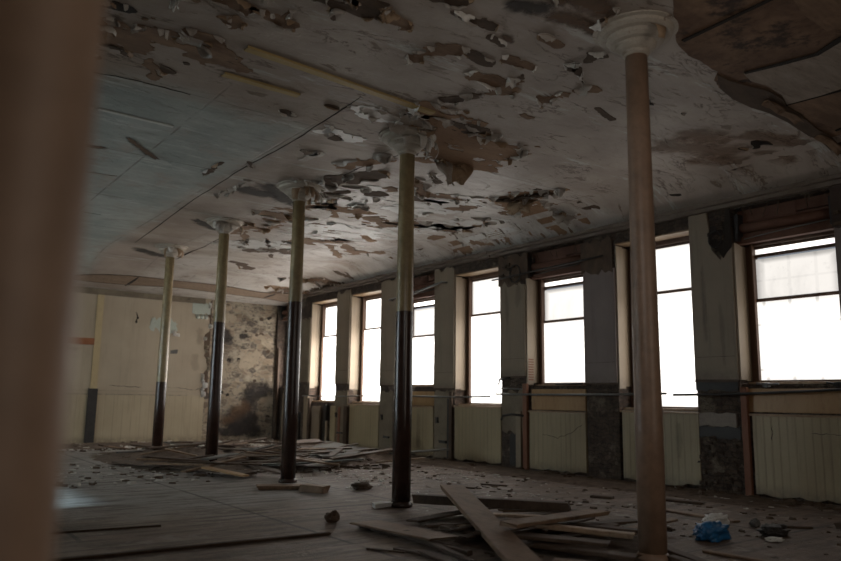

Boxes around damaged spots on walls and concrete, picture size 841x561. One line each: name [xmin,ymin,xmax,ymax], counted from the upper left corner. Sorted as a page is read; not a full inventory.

peeling [102,1,253,81]
peeling [191,0,300,32]
peeling [594,107,616,121]
peeling [310,0,609,287]
peeling [292,153,399,259]
peeling [228,203,293,270]
peeling [264,277,290,293]
peeling [303,271,354,292]
damp [224,328,248,342]
damp [219,382,272,437]